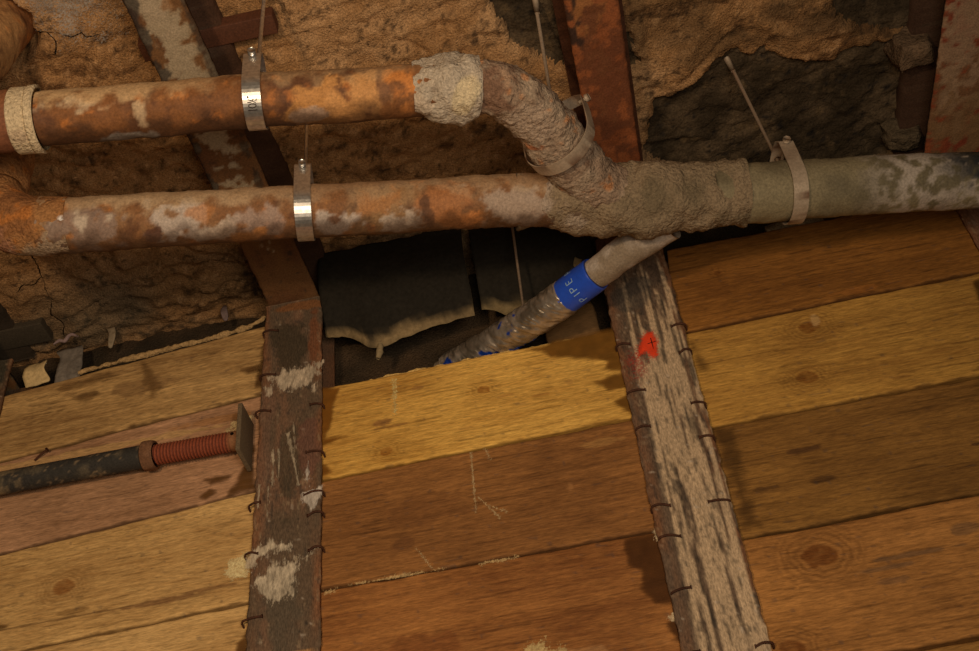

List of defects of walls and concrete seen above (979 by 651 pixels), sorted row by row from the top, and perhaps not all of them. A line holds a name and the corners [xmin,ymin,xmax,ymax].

spalling [490,0,564,65]
spalling [833,0,909,29]
spalling [643,41,900,163]
crack [16,256,64,335]